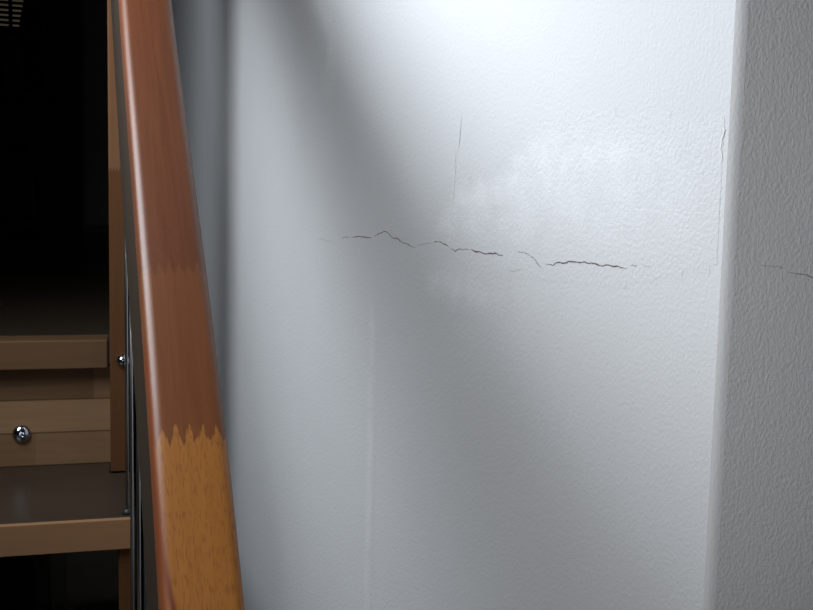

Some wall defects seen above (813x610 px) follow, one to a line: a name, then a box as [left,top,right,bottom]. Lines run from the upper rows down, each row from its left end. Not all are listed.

crack [526,253,636,268]